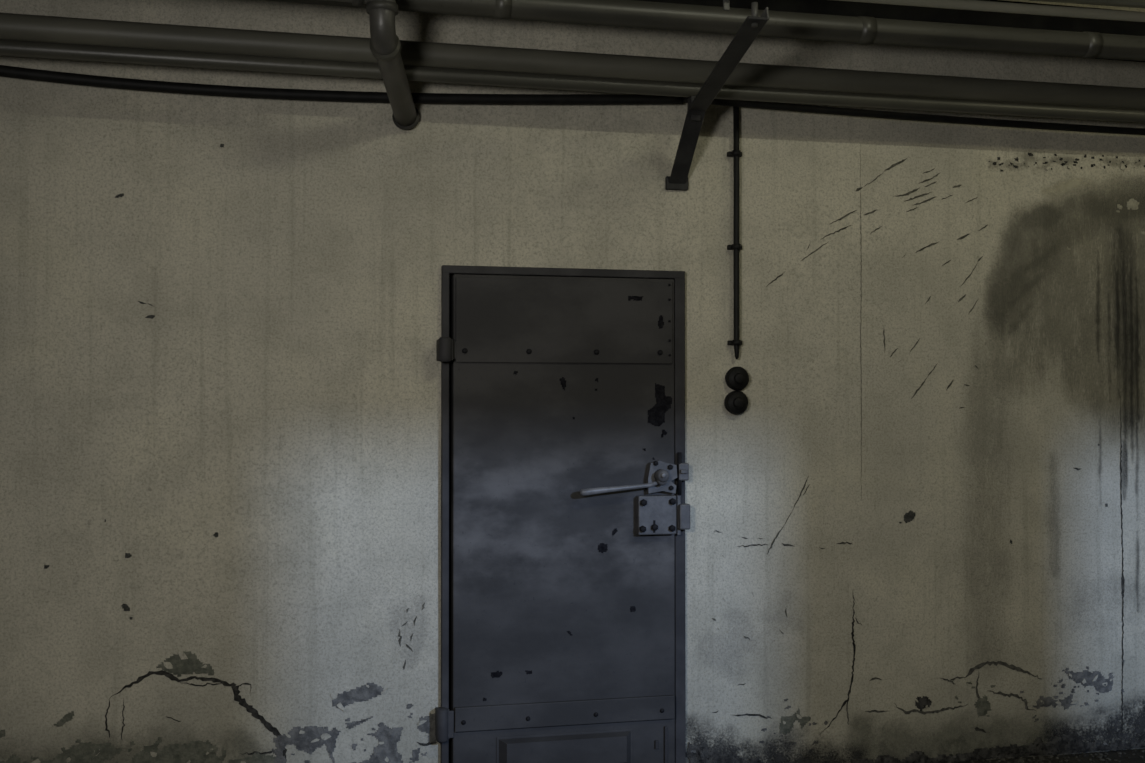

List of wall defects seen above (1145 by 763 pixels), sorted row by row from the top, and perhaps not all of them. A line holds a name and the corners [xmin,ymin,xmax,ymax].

crack [820,596,1040,734]
peeling [54,711,74,727]
peeling [0,737,226,763]
crack [105,670,287,759]
peeling [272,682,437,763]
spalling [686,666,1145,763]